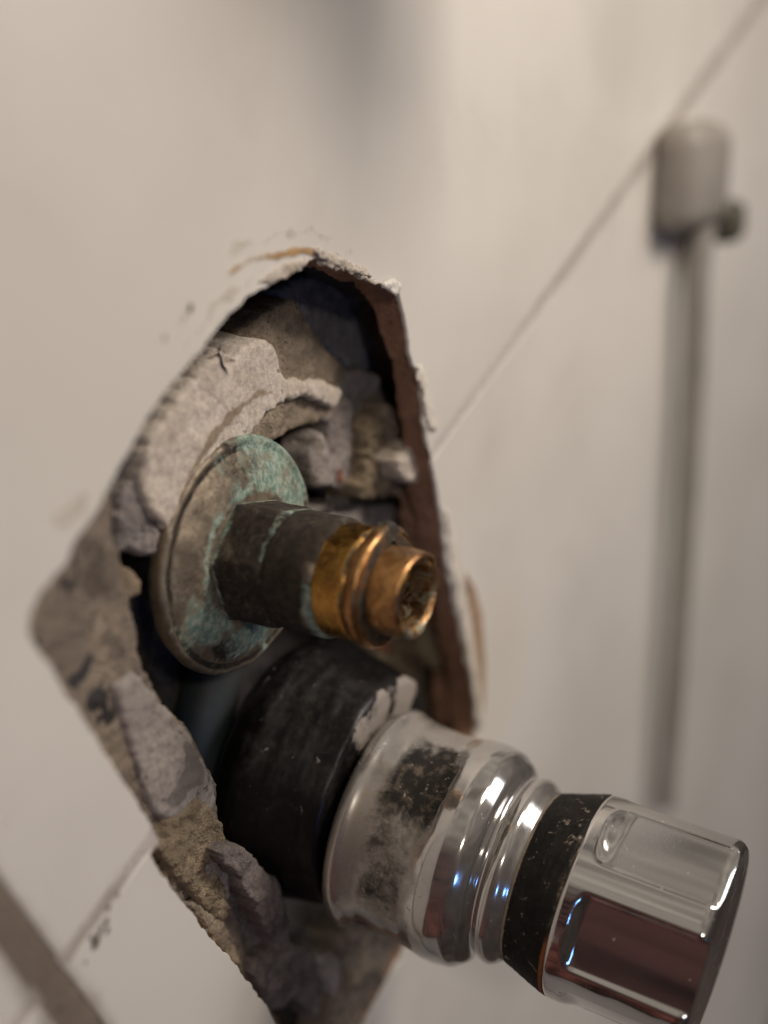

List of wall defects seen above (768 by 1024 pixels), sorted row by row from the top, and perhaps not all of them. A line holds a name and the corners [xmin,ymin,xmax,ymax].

spalling [29,247,485,1024]